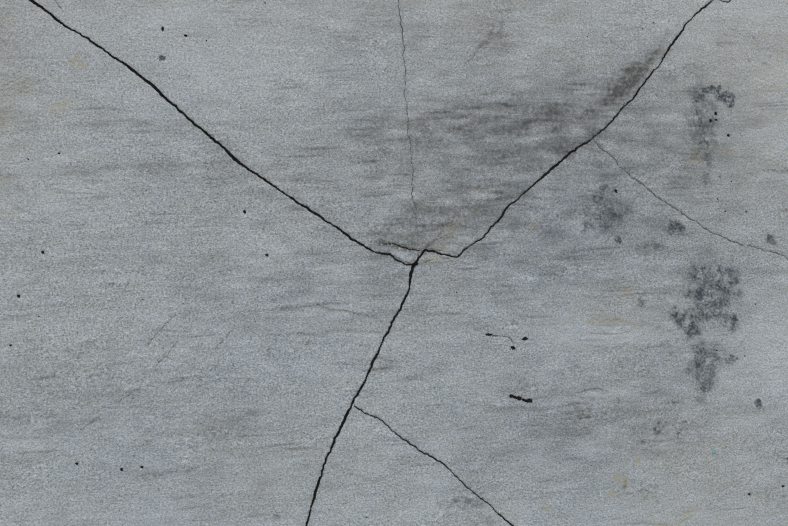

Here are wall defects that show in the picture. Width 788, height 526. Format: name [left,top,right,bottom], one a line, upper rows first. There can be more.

crack [470,0,713,246]
crack [29,0,514,526]
leakage [668,247,748,404]